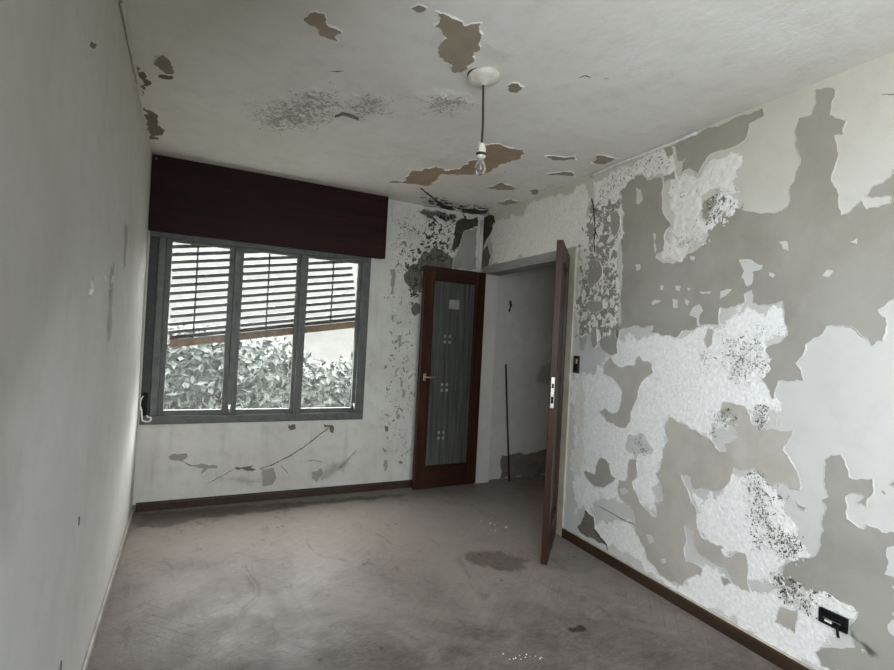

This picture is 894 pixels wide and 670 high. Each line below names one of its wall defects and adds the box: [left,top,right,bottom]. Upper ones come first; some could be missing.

peeling [302,10,343,41]
peeling [410,3,484,73]
peeling [136,54,175,96]
peeling [142,107,166,140]
peeling [388,143,525,186]
peeling [545,155,578,178]
damp [705,185,744,225]
peeling [374,182,539,473]
peeling [574,87,894,670]
peeling [235,464,277,487]
damp [567,297,858,670]